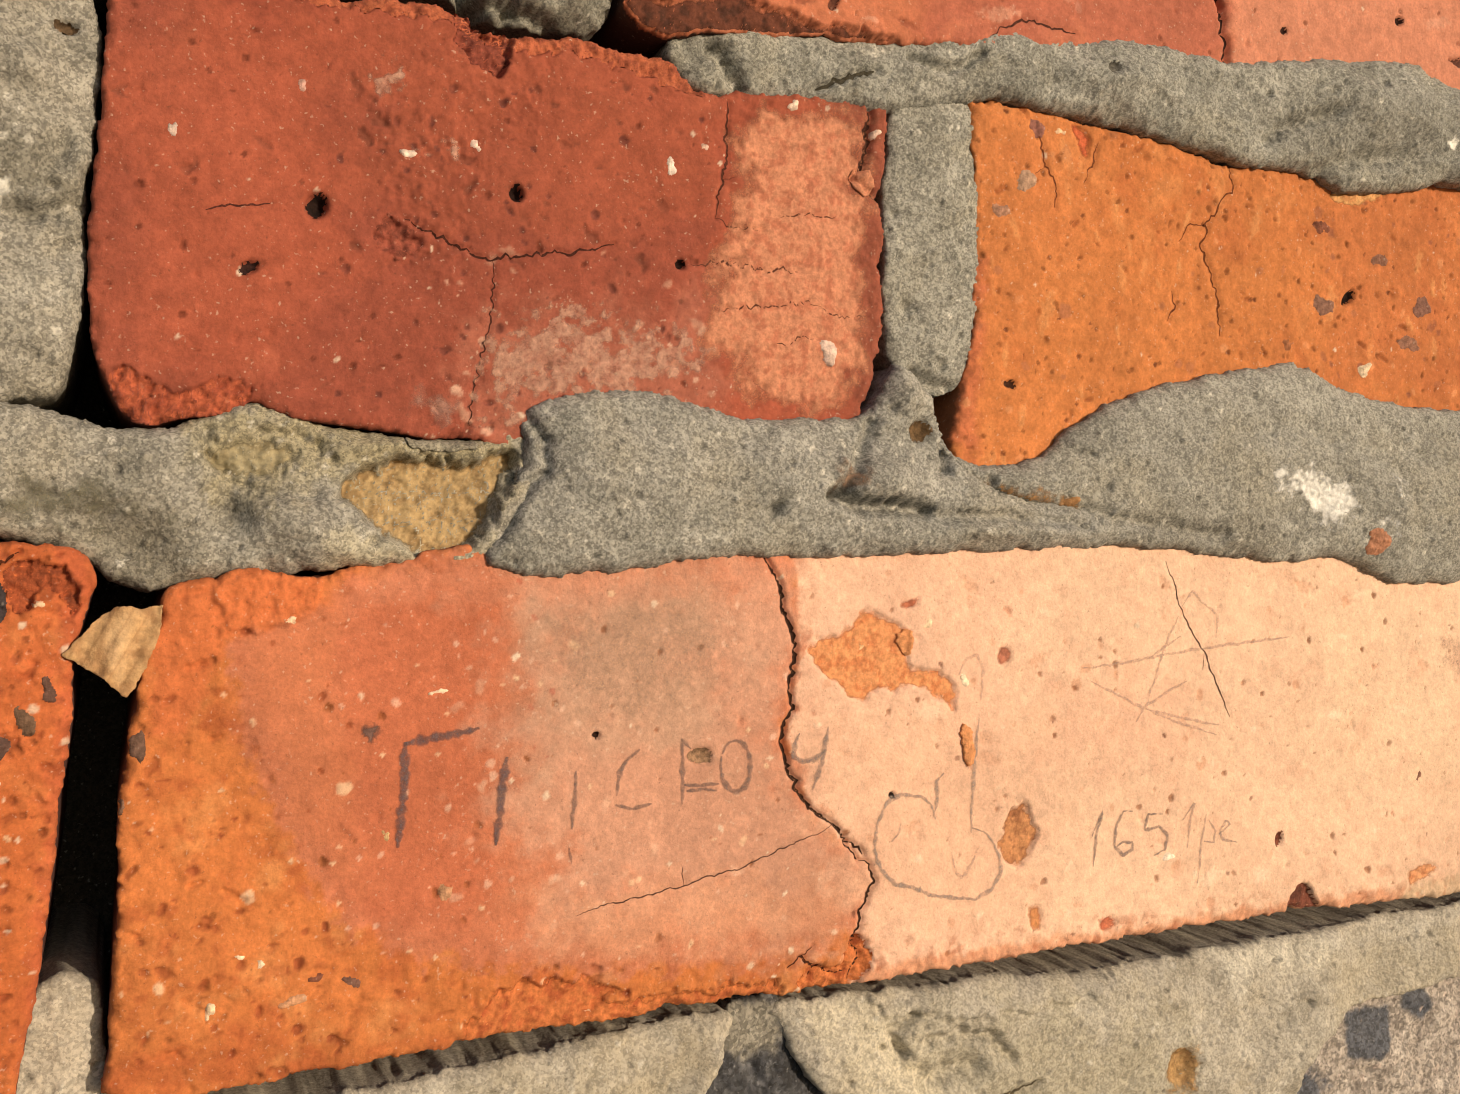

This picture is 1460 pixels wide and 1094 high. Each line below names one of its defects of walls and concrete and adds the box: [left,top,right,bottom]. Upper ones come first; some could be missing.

crack [1179,168,1234,336]
crack [405,219,614,426]
spalling [341,437,517,551]
water stain [1273,462,1358,526]
spalling [808,599,955,707]
crack [577,558,875,978]
spalling [959,723,976,766]